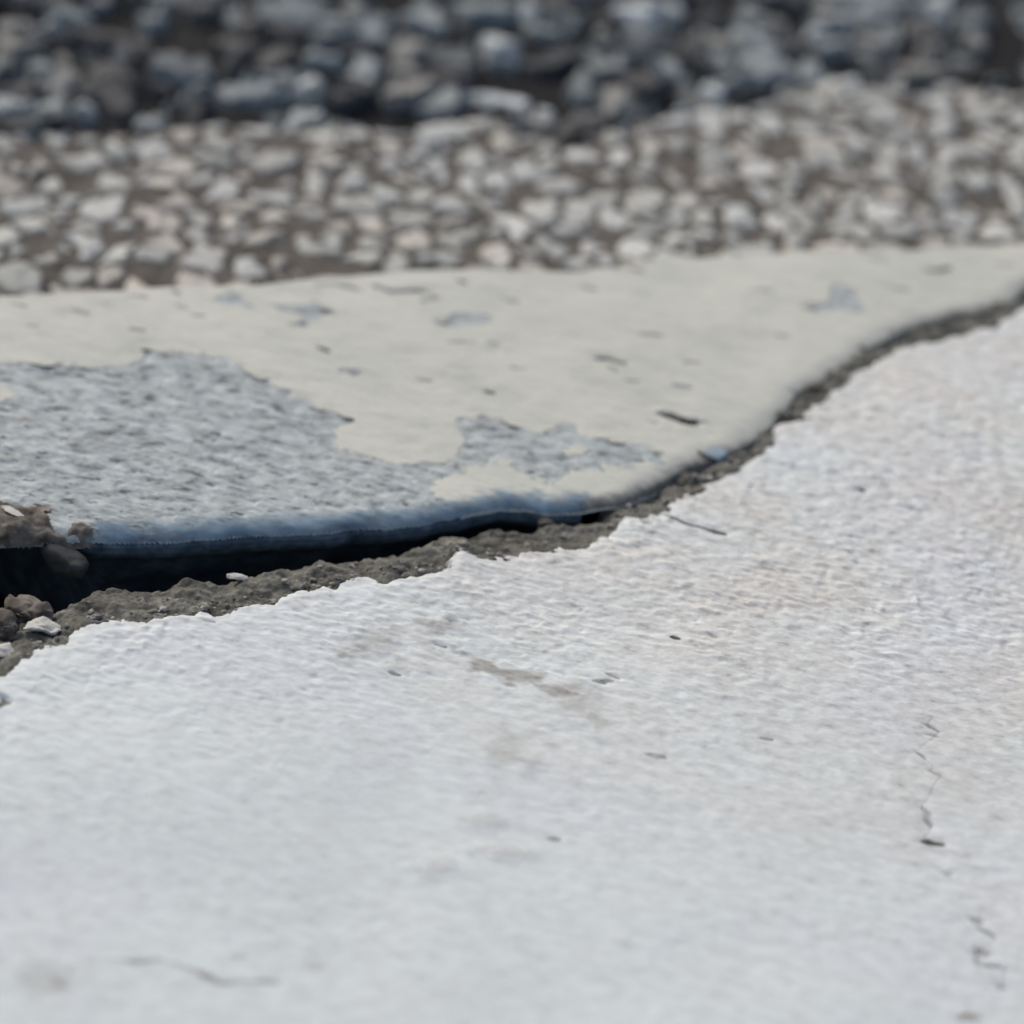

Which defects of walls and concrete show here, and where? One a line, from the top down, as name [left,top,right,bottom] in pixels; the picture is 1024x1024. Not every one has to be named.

peeling [0,349,666,545]
crack [0,292,1024,677]
crack [920,839,945,847]